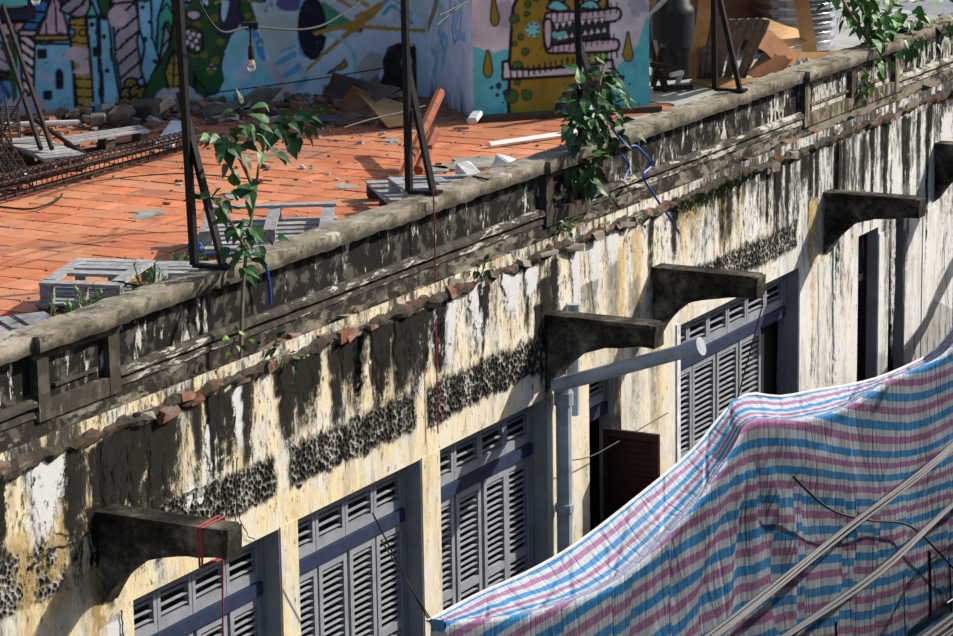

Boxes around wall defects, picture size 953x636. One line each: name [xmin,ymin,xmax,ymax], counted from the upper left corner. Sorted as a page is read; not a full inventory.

peeling [732,185,742,223]
spalling [763,137,802,175]
damp [766,150,820,257]
damp [862,124,890,193]
damp [902,103,933,259]
peeling [941,186,950,221]
peeling [940,104,953,141]
spalling [258,309,379,374]
damp [273,301,448,455]
damp [519,258,559,410]
peeling [818,238,841,386]
damp [60,380,255,636]